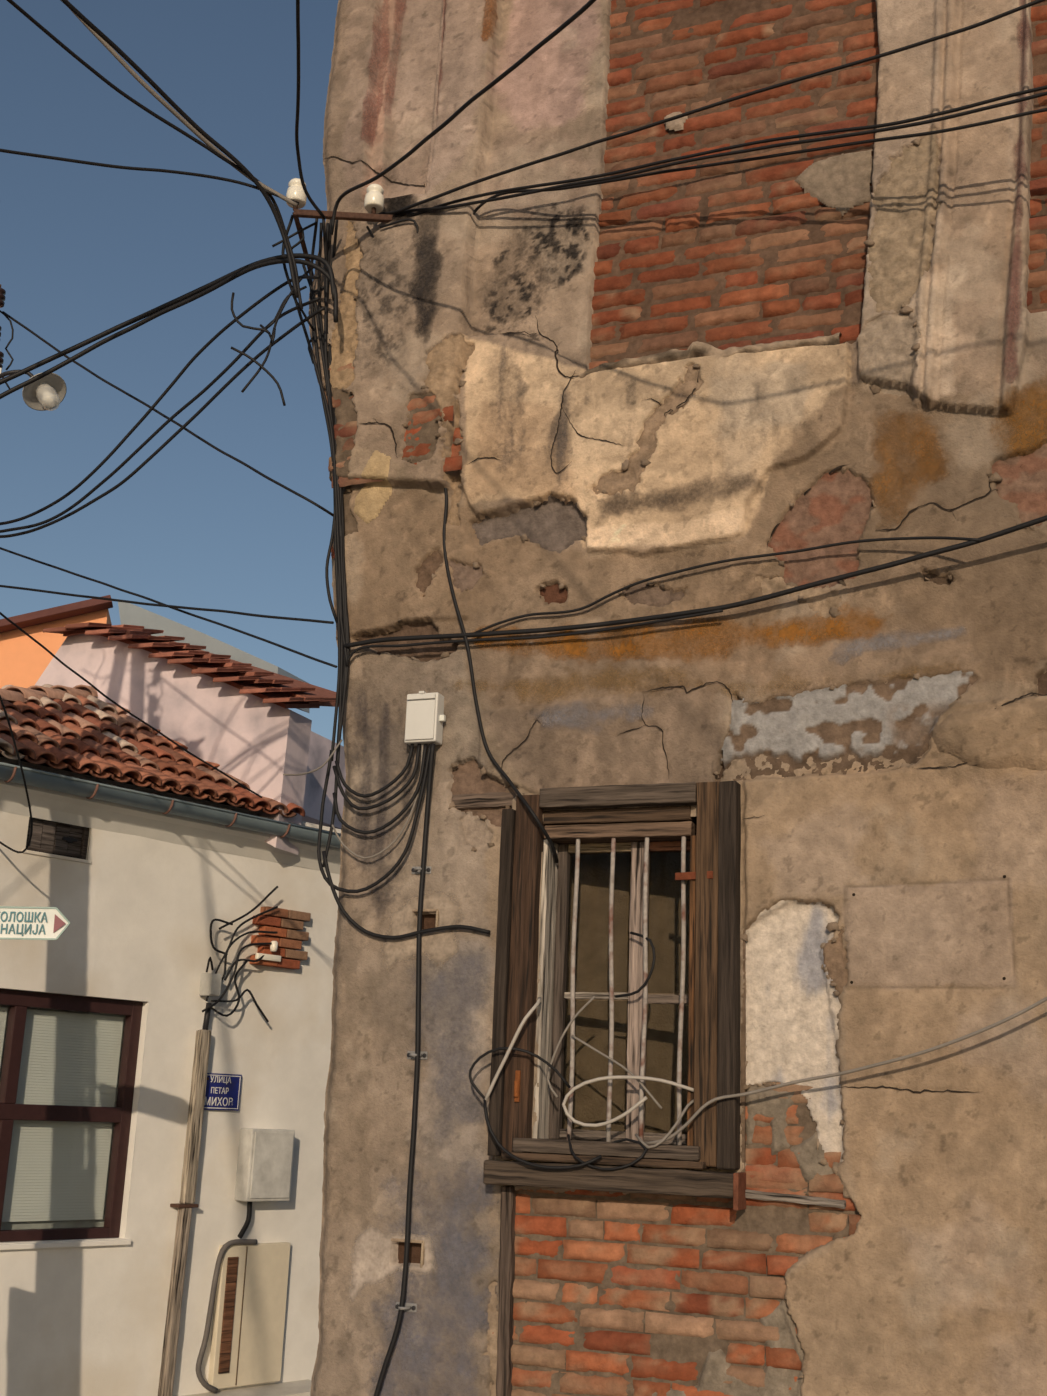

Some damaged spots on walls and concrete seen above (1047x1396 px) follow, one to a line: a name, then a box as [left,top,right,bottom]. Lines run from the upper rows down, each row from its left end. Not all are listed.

flaking render [402,333,588,554]
crack [497,316,622,474]
crack [642,370,700,421]
flaking render [416,549,483,597]
flaking render [539,583,568,604]
flaking render [753,470,876,619]
crack [501,714,544,768]
crack [620,681,733,772]
peeling [713,670,978,779]
flaking render [483,900,861,1396]